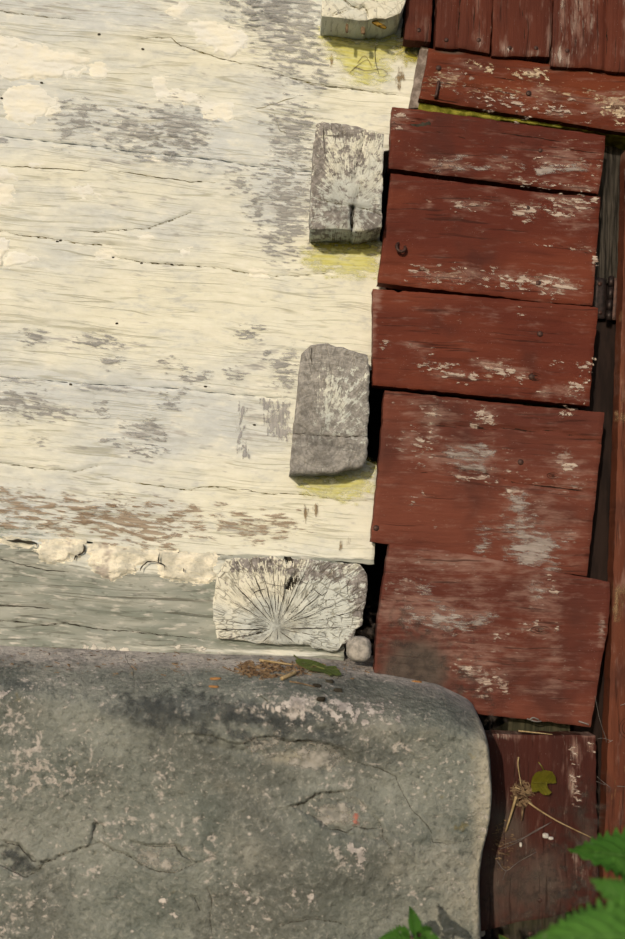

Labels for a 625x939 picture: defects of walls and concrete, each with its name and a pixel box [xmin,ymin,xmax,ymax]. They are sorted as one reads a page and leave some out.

peeling [164,0,249,59]
peeling [0,35,111,126]
damp [224,0,418,274]
peeling [435,60,589,123]
peeling [595,97,625,126]
damp [0,467,376,550]
spalling [0,535,220,586]
crack [0,561,359,689]
crack [210,736,481,847]
crack [0,823,196,878]